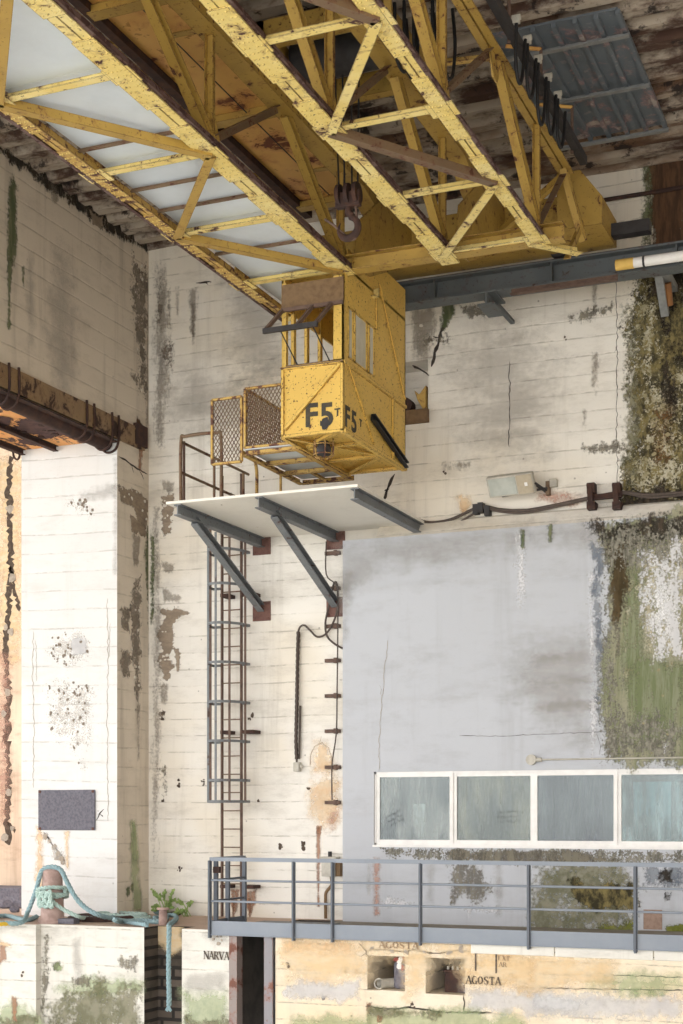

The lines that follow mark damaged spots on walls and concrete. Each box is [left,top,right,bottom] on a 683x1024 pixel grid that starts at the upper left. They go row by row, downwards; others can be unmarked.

damp [0,146,148,254]
damp [647,273,683,443]
rust [0,416,65,447]
crack [505,361,513,445]
peeling [117,484,148,537]
peeling [120,576,142,702]
peeling [157,608,189,681]
damp [587,538,632,756]
spalling [48,681,88,749]
rust [311,746,338,907]
damp [450,864,492,905]
damp [645,867,683,900]